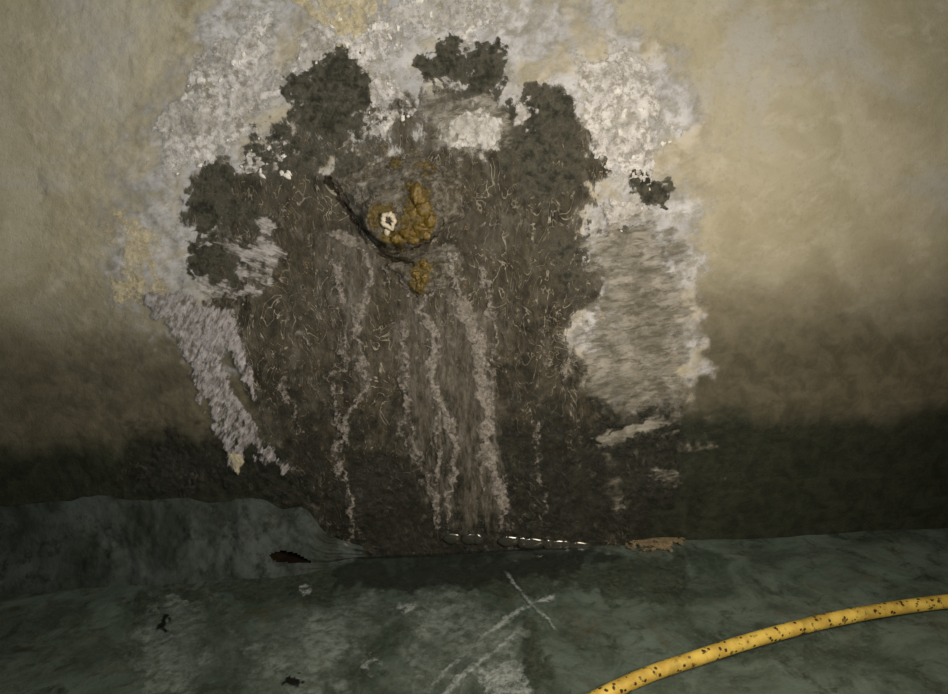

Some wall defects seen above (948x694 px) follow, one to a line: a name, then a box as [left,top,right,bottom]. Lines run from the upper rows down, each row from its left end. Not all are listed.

crack [323,176,444,281]
rust [365,158,437,252]
rust [407,257,434,294]
damp [98,0,715,694]